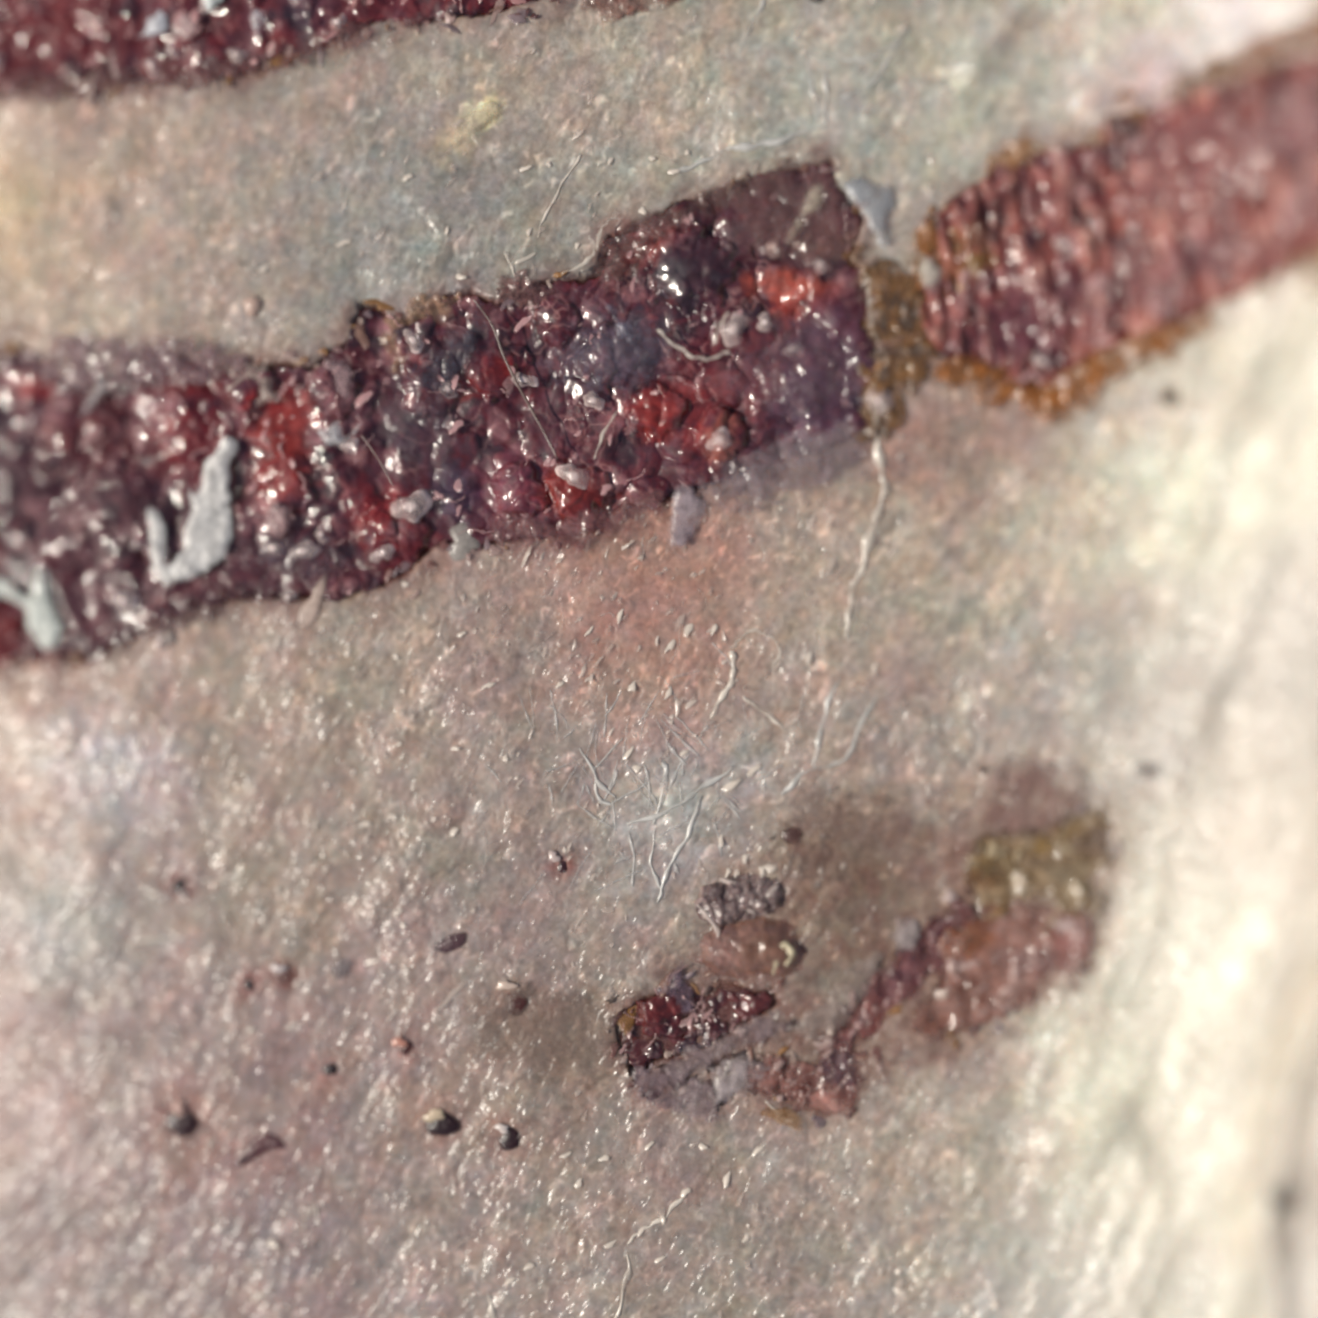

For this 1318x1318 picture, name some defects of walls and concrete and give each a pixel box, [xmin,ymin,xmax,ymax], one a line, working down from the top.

peeling [648,149,690,175]
peeling [837,180,891,225]
peeling [146,438,237,584]
peeling [269,507,287,534]
peeling [522,546,562,596]
peeling [0,567,61,650]
peeling [637,614,752,705]
peeling [450,746,524,787]
peeling [556,644,733,887]
peeling [698,765,776,878]
peeling [506,1262,534,1285]
peeling [878,1256,907,1296]